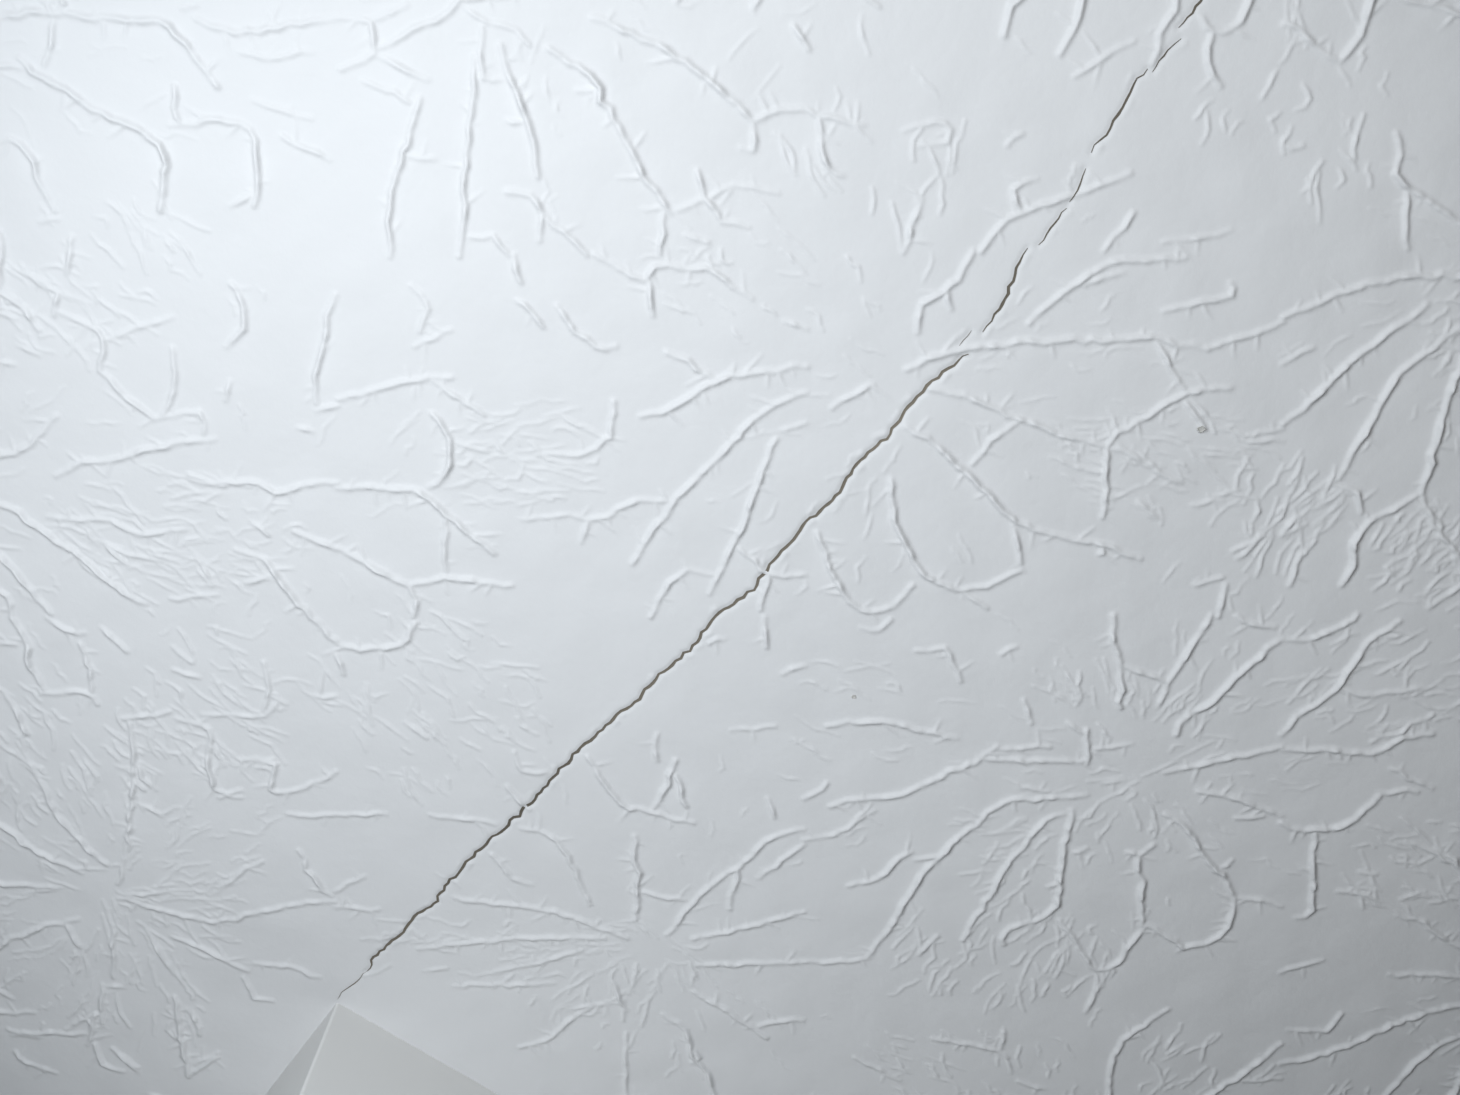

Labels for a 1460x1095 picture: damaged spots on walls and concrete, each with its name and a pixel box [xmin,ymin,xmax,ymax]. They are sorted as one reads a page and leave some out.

crack [338,0,1203,998]